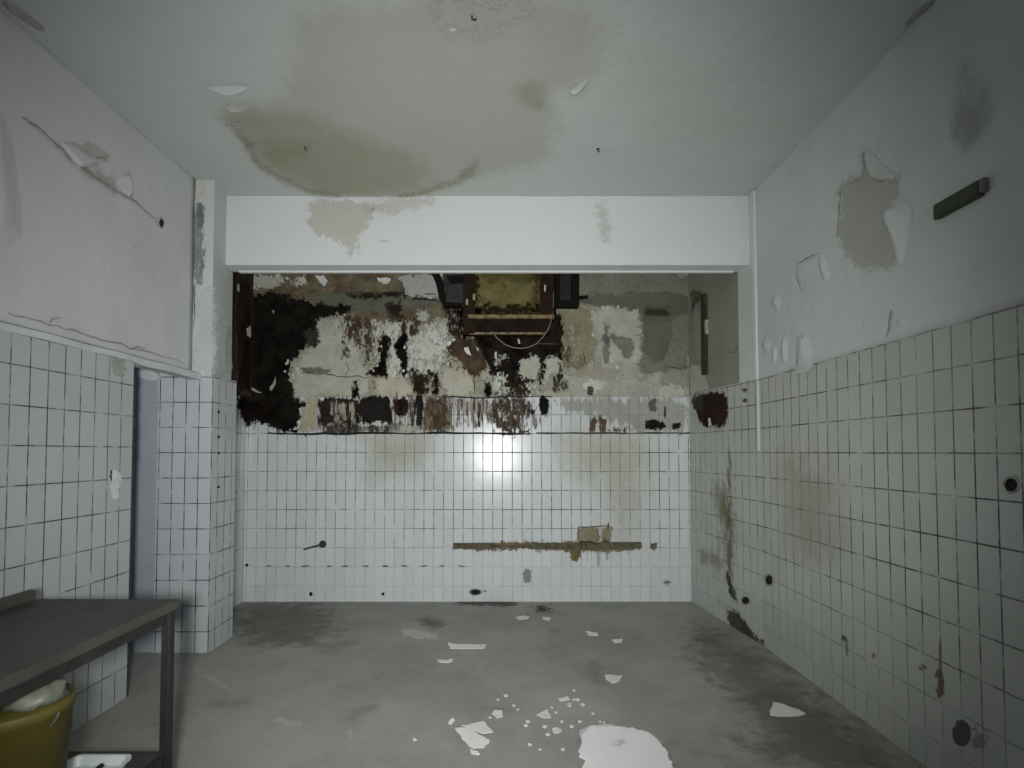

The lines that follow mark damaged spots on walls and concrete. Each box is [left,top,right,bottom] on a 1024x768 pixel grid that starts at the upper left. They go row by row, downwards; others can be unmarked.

peeling [60,139,111,170]
crack [23,117,157,222]
spalling [193,179,206,320]
peeling [253,274,328,290]
peeling [836,148,912,272]
spalling [270,274,709,402]
corrosion [469,522,657,562]
water stain [726,452,765,646]
corrosion [918,664,945,698]